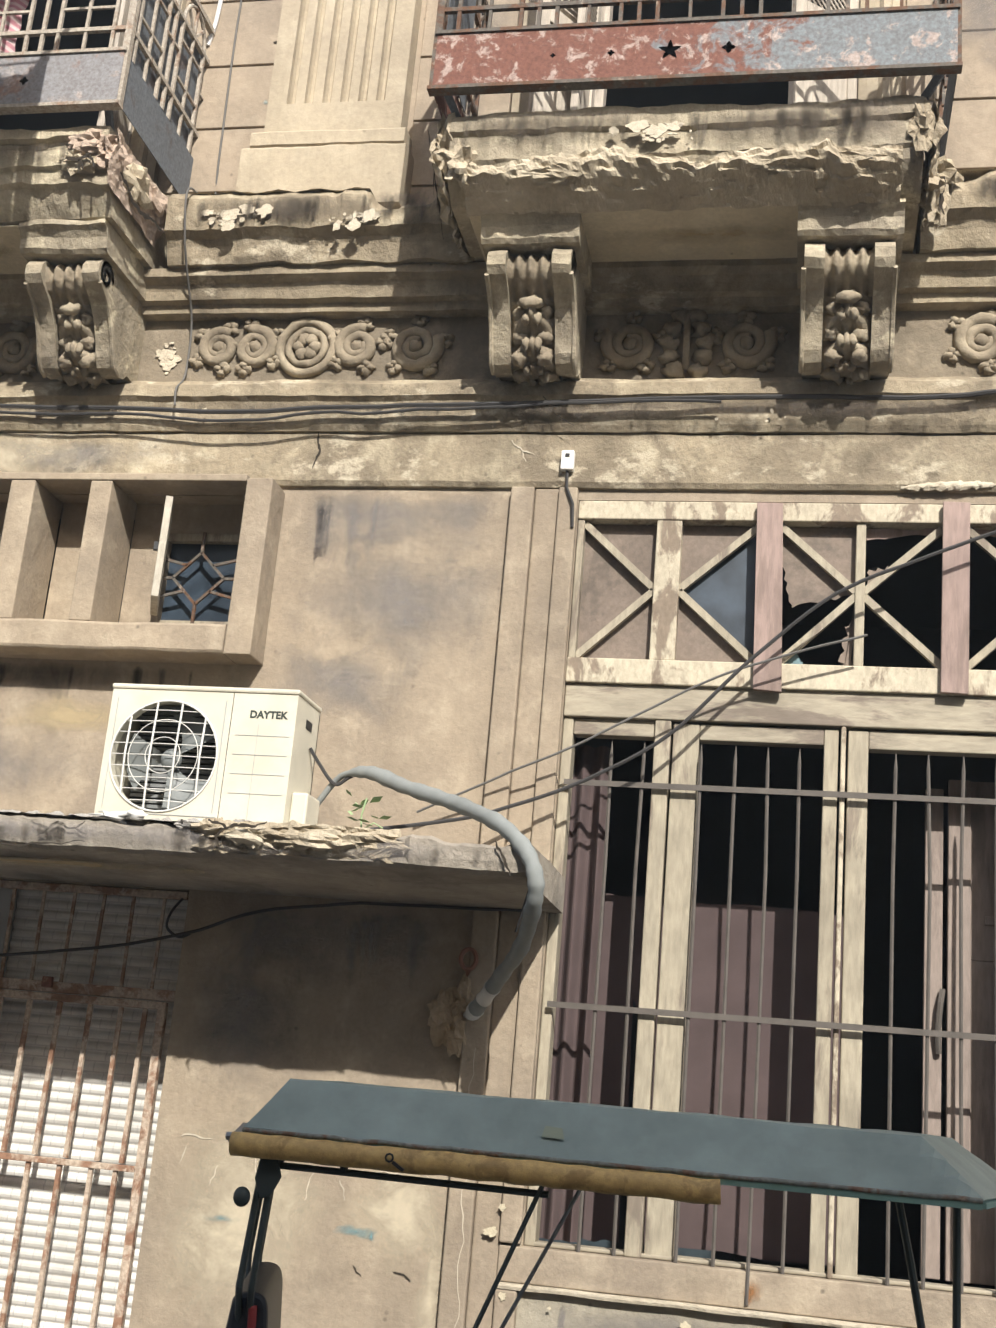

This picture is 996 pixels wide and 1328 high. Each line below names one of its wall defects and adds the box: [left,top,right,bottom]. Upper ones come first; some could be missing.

spalling [58,127,168,247]
peeling [194,187,381,232]
spalling [429,93,996,264]
leakage [527,403,764,413]
leakage [789,402,949,412]
crack [0,821,87,861]
spalling [0,809,412,864]
crack [208,819,267,846]